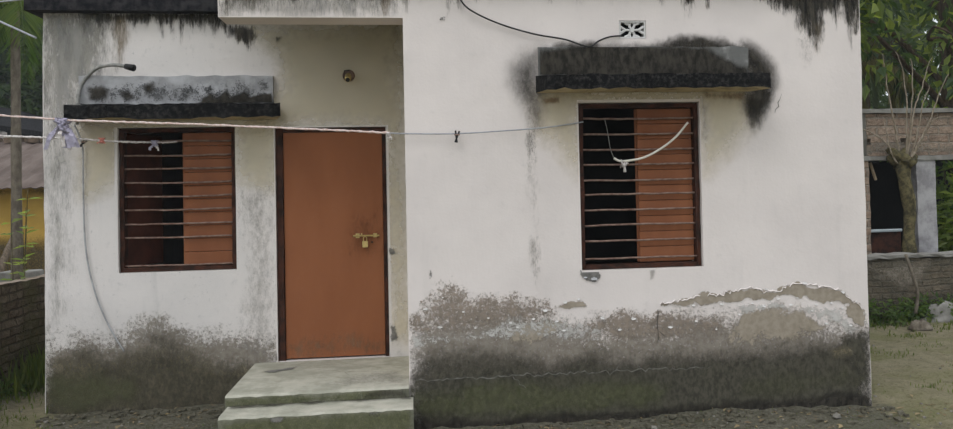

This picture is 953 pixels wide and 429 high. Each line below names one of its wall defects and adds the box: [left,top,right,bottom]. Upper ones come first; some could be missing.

damp [43,0,384,128]
damp [518,36,775,122]
damp [767,0,859,45]
damp [46,312,275,414]
spalling [580,270,601,282]
damp [365,259,953,429]
peeling [582,281,866,346]